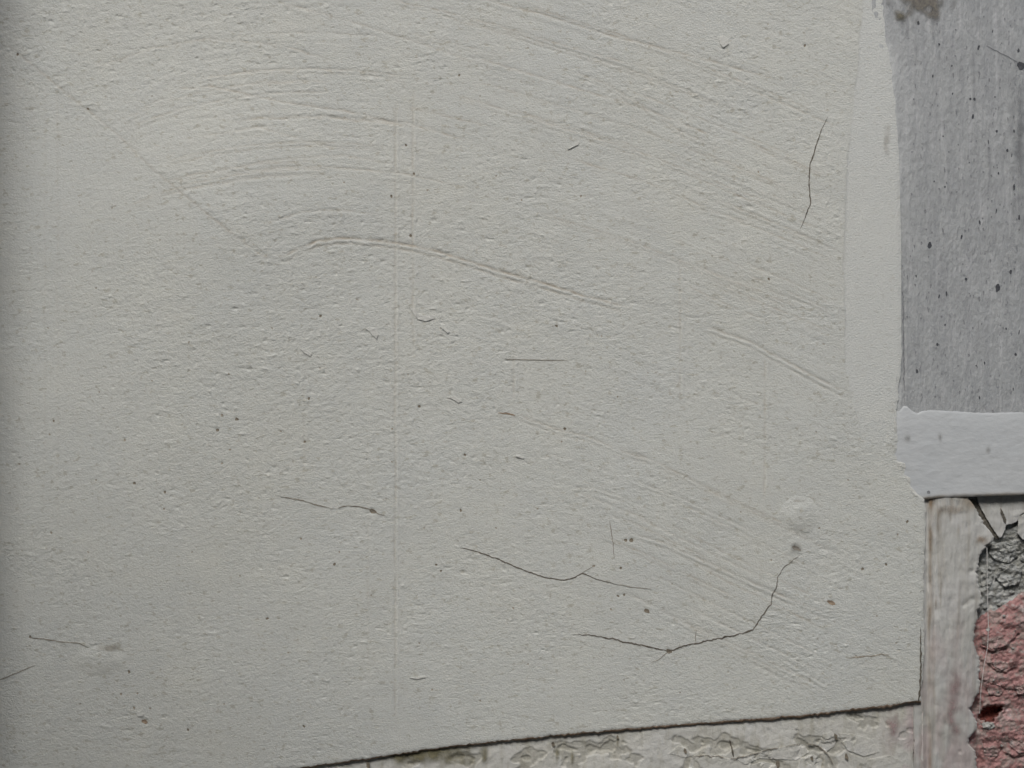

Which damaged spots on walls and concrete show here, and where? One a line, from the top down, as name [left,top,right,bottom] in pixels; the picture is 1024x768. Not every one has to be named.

crack [801,117,828,227]
crack [283,497,385,516]
crack [462,525,648,589]
peeling [977,495,1024,539]
crack [574,558,796,662]
peeling [978,626,1024,757]